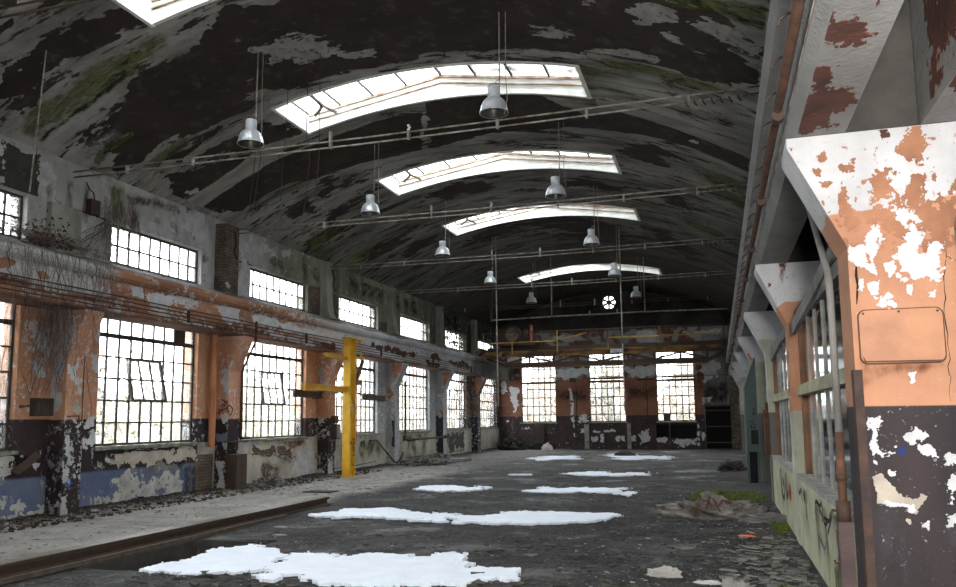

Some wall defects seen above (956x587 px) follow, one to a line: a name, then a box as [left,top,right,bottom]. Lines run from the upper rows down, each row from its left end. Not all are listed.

peeling [0,8,137,117]
peeling [798,65,859,135]
peeling [825,11,878,48]
peeling [76,0,759,298]
peeling [810,126,956,309]
peeling [129,286,213,328]
peeling [251,314,342,350]
peeling [24,320,101,516]
peeling [556,367,706,460]
peeling [0,455,44,519]
peeling [94,446,198,505]
peeling [866,416,956,531]